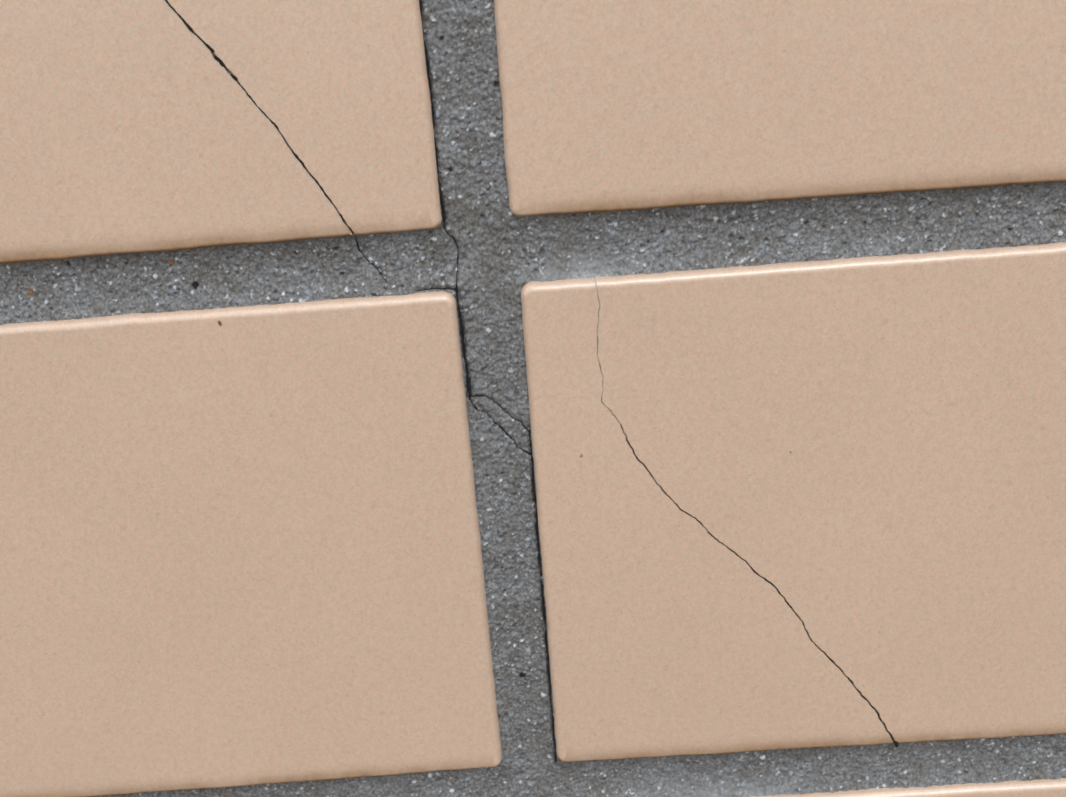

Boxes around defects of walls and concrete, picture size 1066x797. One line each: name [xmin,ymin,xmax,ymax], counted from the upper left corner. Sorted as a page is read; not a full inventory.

crack [163,0,388,283]
crack [416,229,459,291]
crack [468,395,531,455]
crack [601,397,899,747]